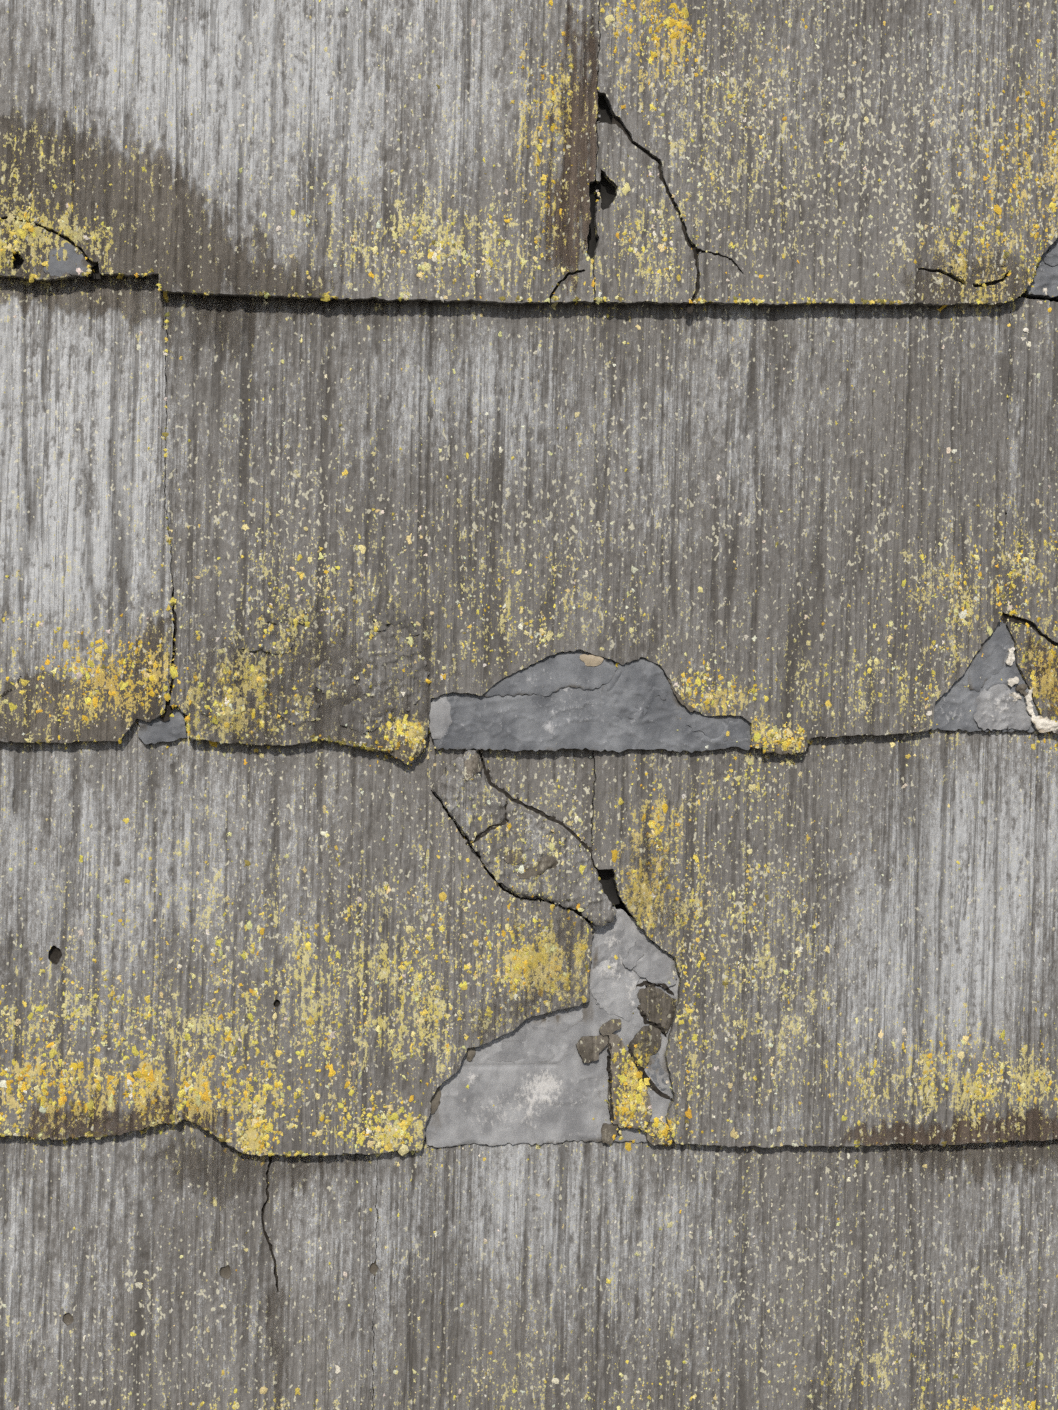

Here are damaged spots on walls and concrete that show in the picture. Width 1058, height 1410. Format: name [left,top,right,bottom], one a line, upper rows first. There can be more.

crack [612,117,736,314]
crack [549,270,584,300]
crack [919,269,1008,287]
spalling [1022,238,1058,304]
peeling [238,605,309,655]
crack [1001,613,1058,646]
peeling [201,687,246,725]
spalling [910,620,1058,733]
spalling [278,608,751,1148]
crack [261,1156,279,1292]